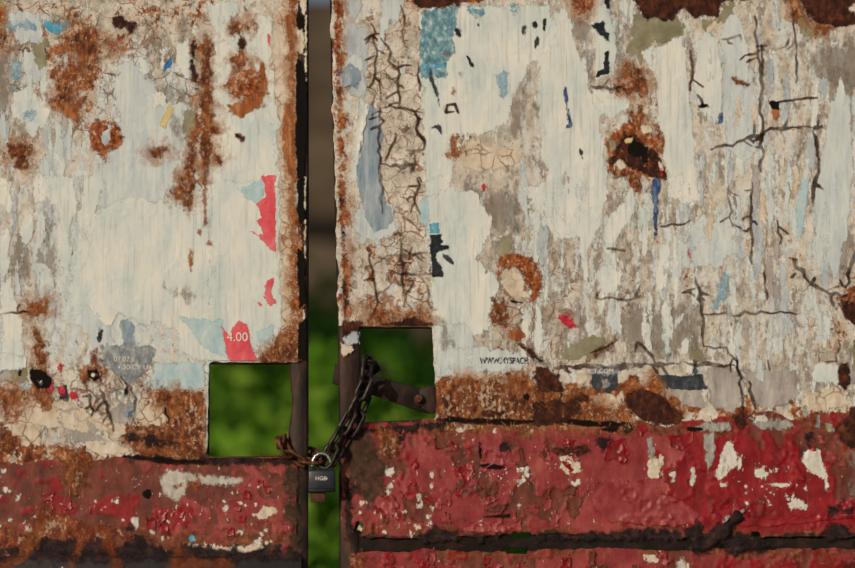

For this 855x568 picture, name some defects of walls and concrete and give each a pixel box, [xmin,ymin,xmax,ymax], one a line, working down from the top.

corrosion [169,5,269,211]
peeling [271,0,308,346]
corrosion [333,0,436,336]
crack [364,23,426,213]
crack [364,232,430,315]
crack [444,87,459,114]
crack [560,16,855,410]
peeling [0,399,166,458]
corrosion [121,384,206,466]
peeling [409,391,701,533]
corrosion [438,343,686,436]
peeling [668,340,855,490]